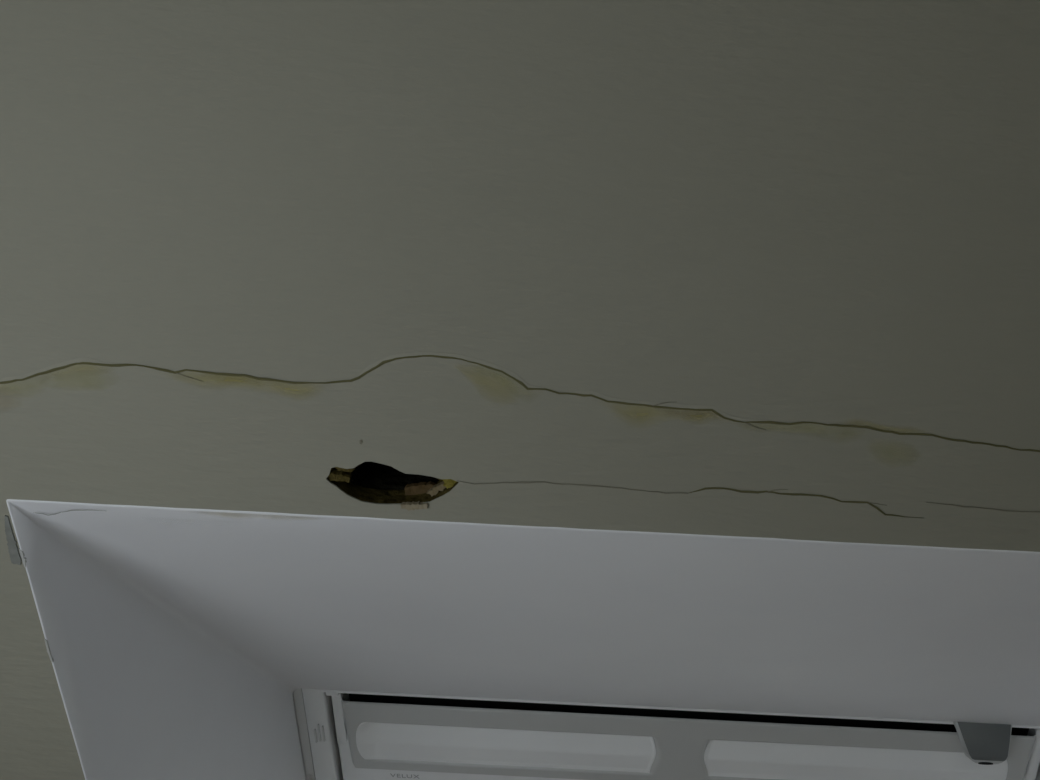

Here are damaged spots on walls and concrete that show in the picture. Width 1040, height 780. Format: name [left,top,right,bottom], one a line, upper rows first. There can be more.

crack [0,352,1040,452]
spalling [328,462,457,511]
crack [459,481,1040,518]